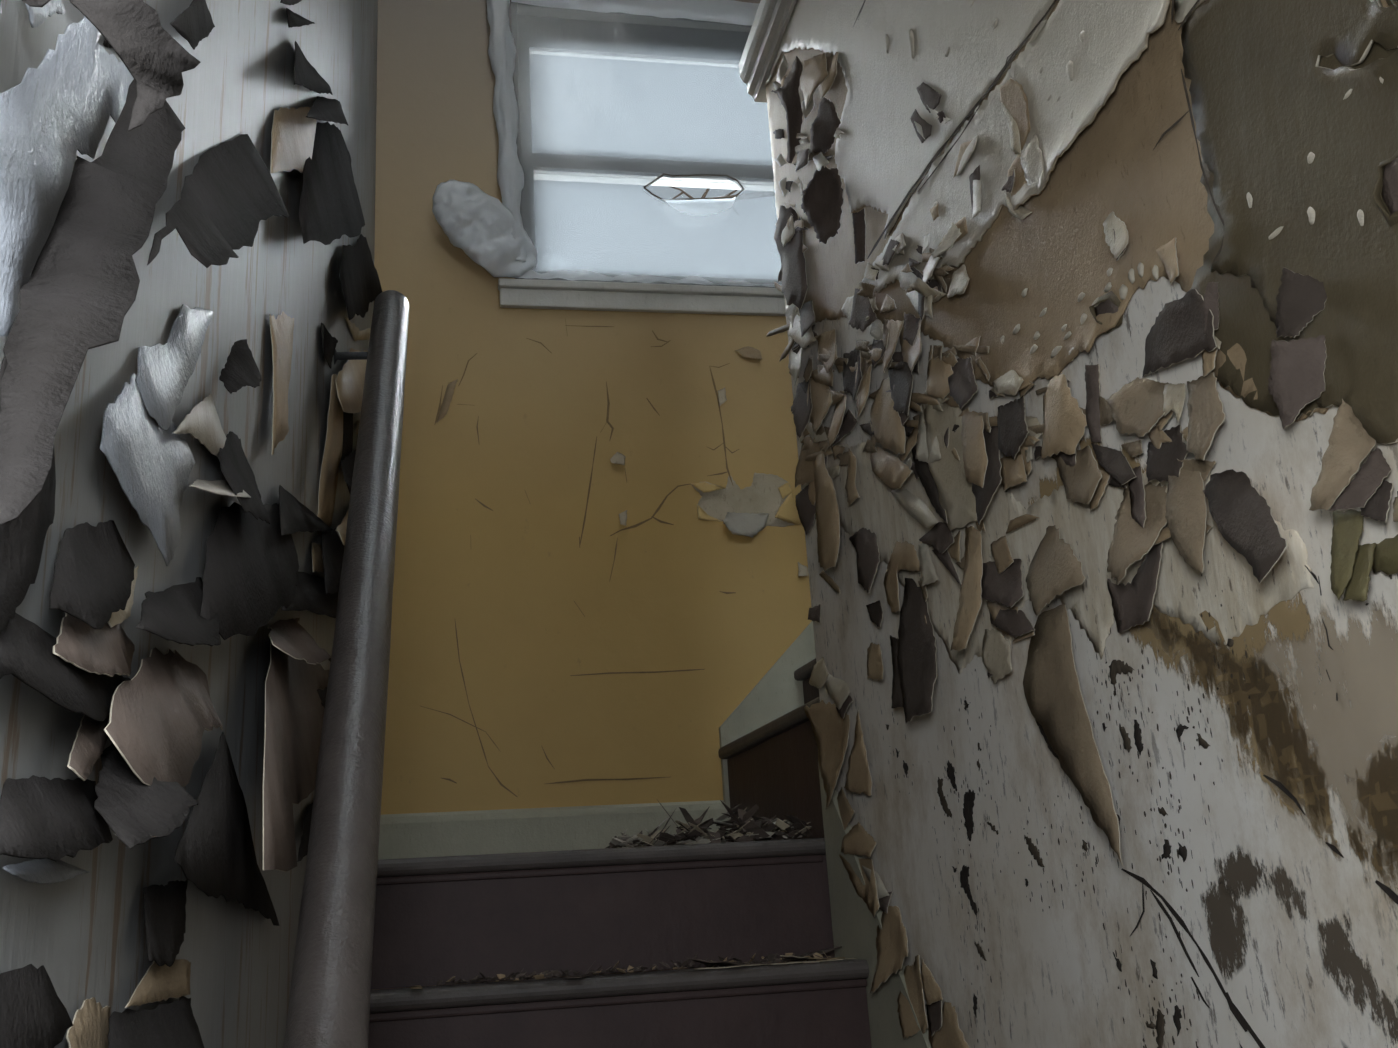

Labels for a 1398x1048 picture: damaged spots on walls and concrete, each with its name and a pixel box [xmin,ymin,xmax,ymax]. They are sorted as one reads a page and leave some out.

peeling [1268,267,1327,430]
crack [579,363,739,582]
peeling [691,52,1287,1048]
water stain [1029,467,1063,505]
peeling [1309,399,1398,606]
water stain [1128,593,1398,901]
water stain [1201,847,1398,1044]